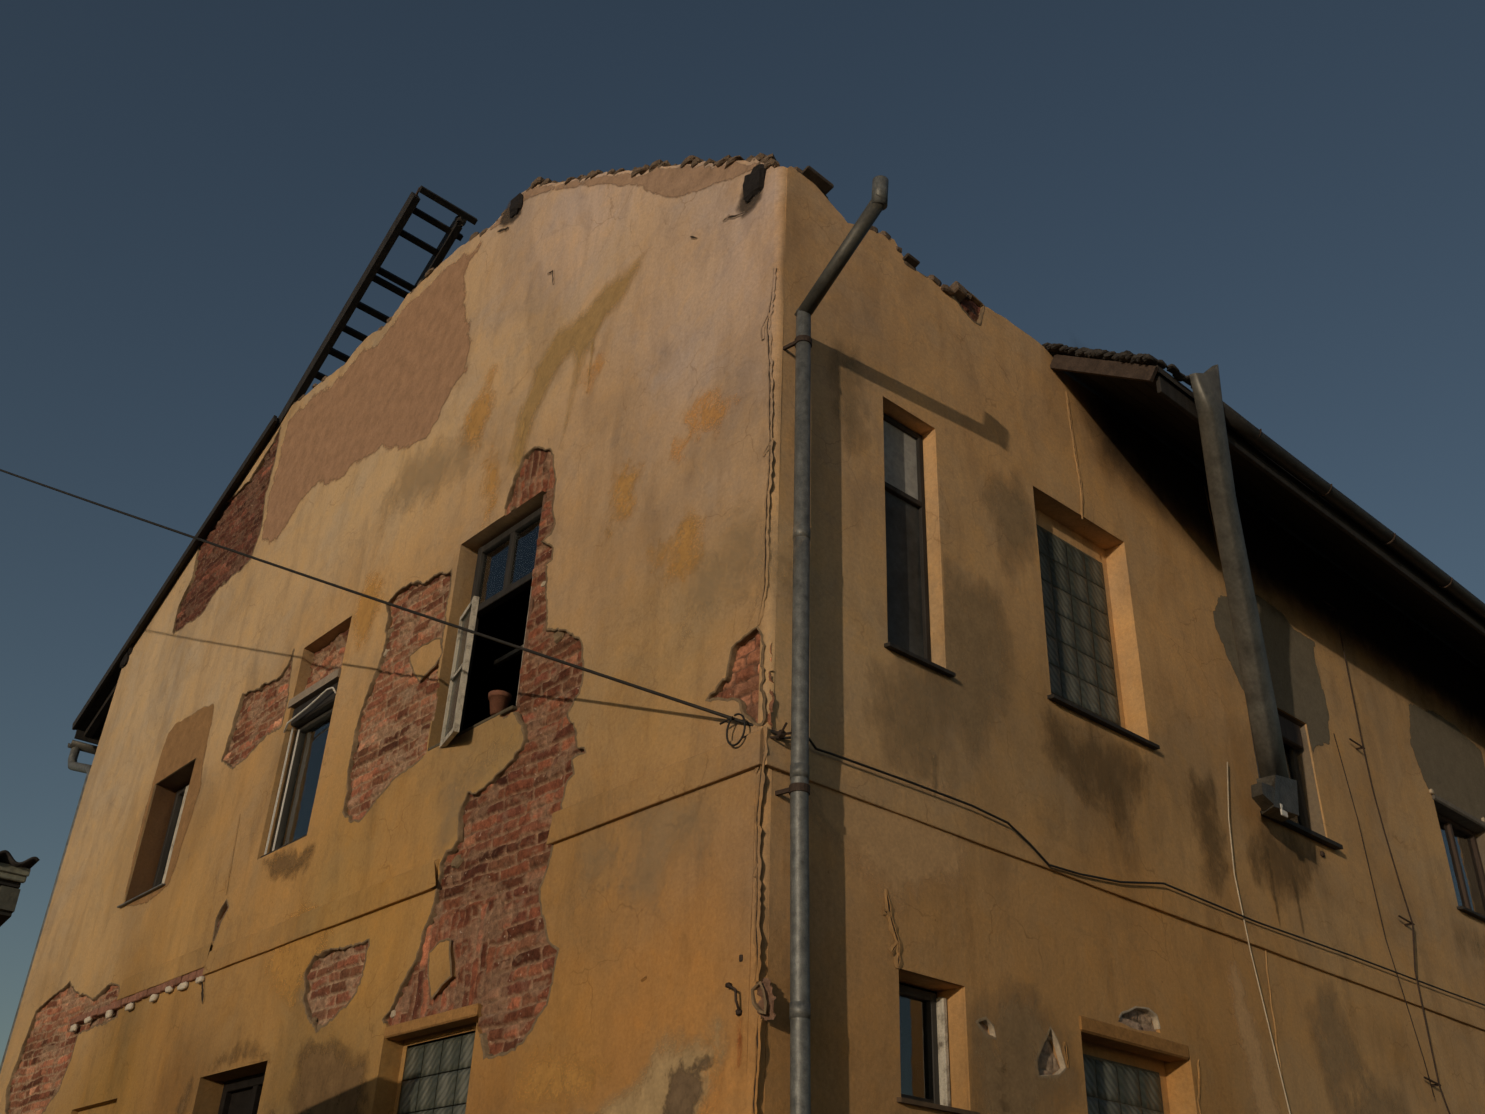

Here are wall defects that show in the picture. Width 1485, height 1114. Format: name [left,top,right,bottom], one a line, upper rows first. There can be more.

spalling [172,426,281,635]
leakage [514,267,635,466]
crack [757,266,777,625]
spalling [221,649,295,769]
spalling [342,569,452,823]
spalling [382,446,586,1060]
spalling [705,626,774,728]
spalling [5,968,205,1114]
spalling [271,930,370,1033]
leakage [600,1023,723,1114]
crack [752,725,768,1114]
spalling [1037,1026,1067,1077]